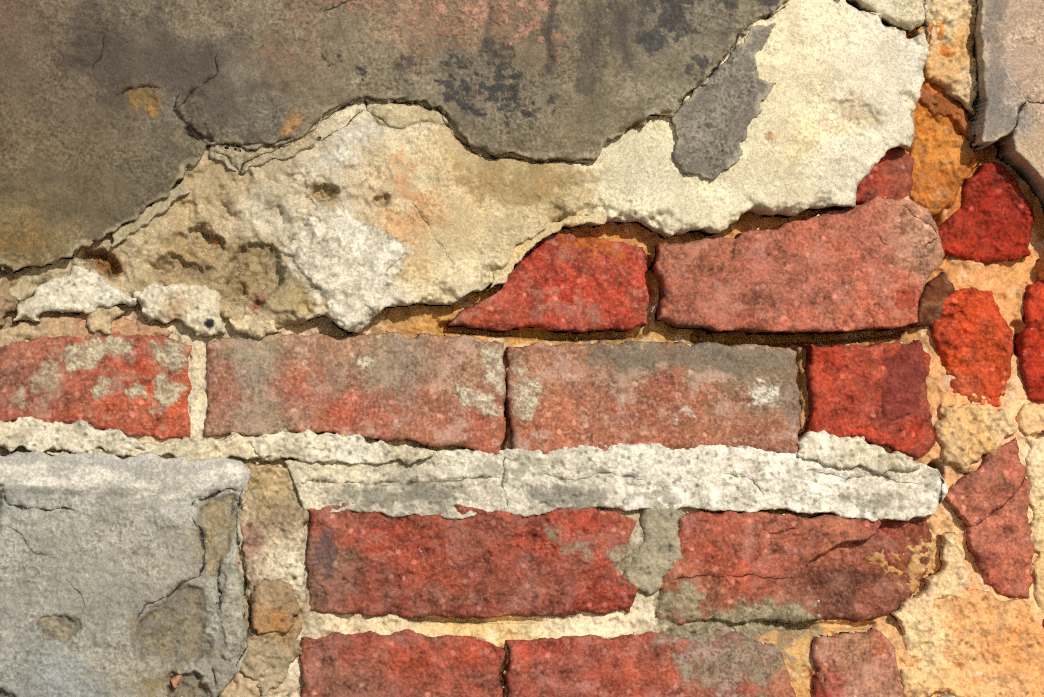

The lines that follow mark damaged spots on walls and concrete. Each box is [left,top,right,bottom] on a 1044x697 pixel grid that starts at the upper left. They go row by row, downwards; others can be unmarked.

spalling [319,99,452,168]
crack [1000,60,1044,131]
spalling [12,265,279,340]
spalling [281,206,411,328]
spalling [870,339,927,420]
spalling [36,614,82,643]
spalling [130,581,214,667]
crack [138,488,252,697]
spalling [197,458,310,696]
spalling [810,669,832,697]
spalling [856,536,937,594]
spalling [899,589,1044,697]